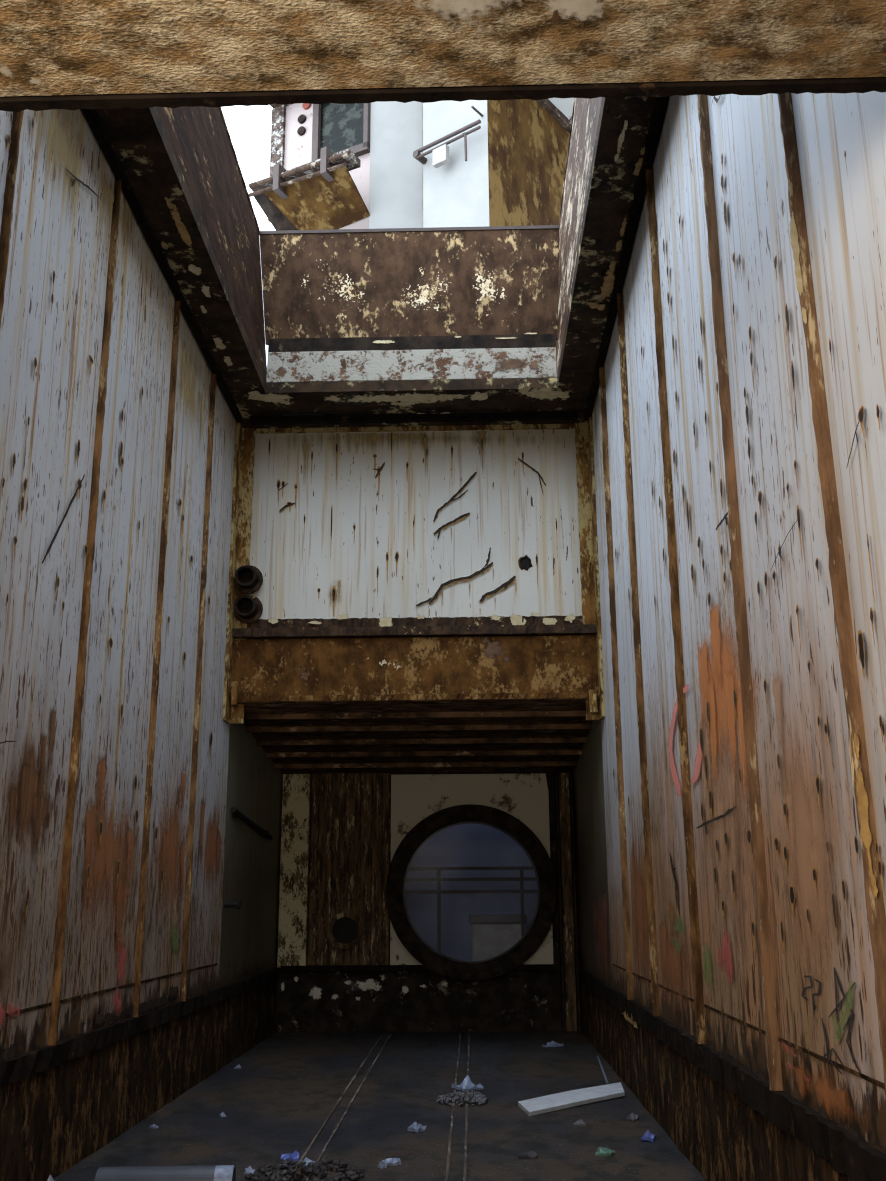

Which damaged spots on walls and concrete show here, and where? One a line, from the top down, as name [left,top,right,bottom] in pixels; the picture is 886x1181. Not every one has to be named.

peeling [164,197,211,313]
peeling [300,259,365,320]
peeling [396,267,448,311]
peeling [473,269,506,316]
peeling [475,357,539,371]
rust [744,326,762,542]
crack [433,472,477,539]
rust [786,460,819,581]
crack [416,547,517,615]
rust [84,758,138,947]
rust [200,800,222,886]
rust [795,1064,849,1115]